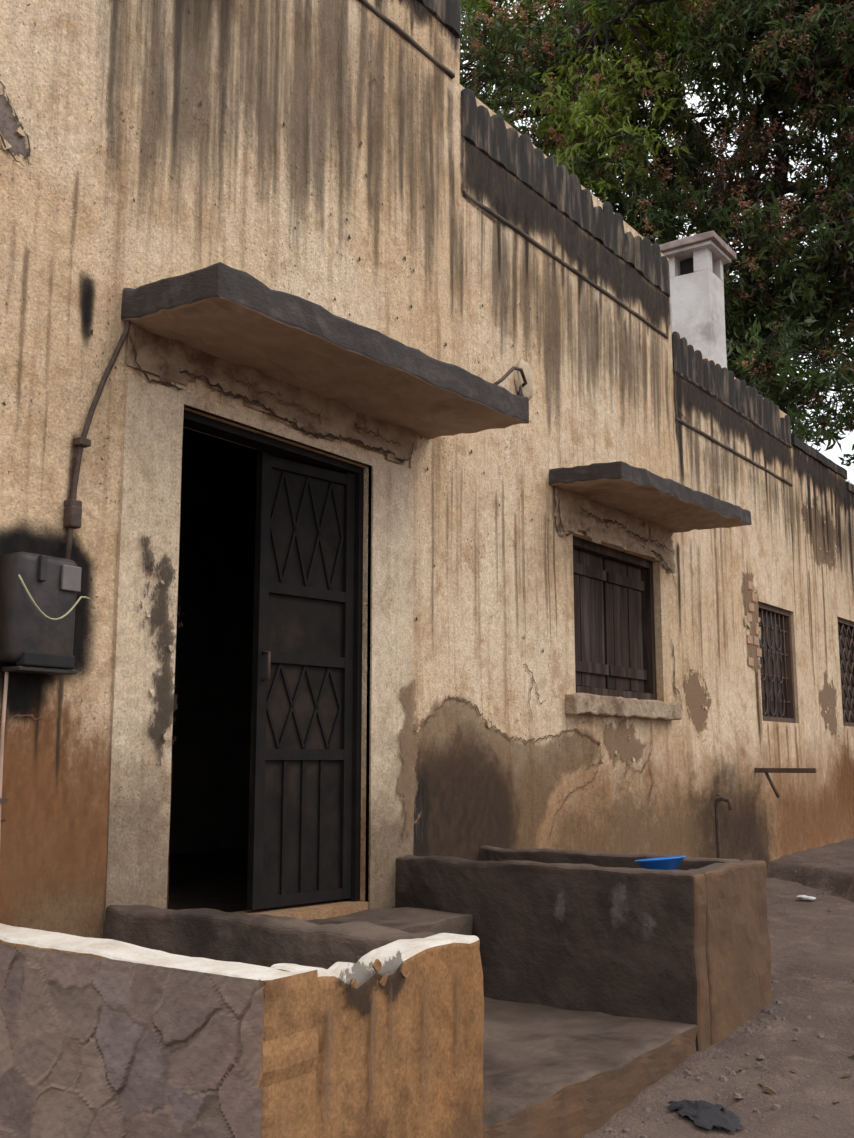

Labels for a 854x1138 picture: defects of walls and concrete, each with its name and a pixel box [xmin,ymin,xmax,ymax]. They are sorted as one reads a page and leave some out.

peeling [0,74,31,166]
damp [108,0,121,149]
damp [141,0,385,227]
damp [81,276,95,339]
damp [398,0,854,683]
flaking render [126,323,422,465]
flaking render [549,486,676,585]
peeling [741,572,762,673]
peeling [682,667,712,738]
peeling [819,671,839,737]
damp [412,694,604,861]
spalling [338,951,409,1017]